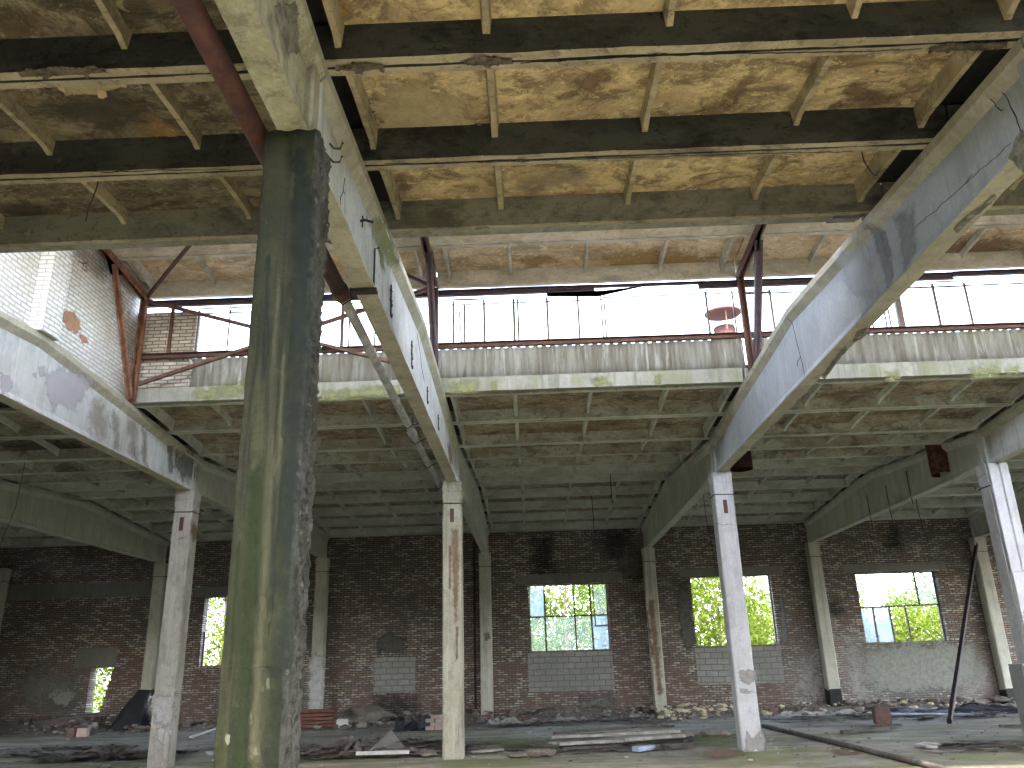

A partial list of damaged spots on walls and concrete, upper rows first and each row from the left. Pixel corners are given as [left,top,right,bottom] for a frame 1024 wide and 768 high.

spalling [18,66,127,99]
spalling [461,55,513,69]
crack [914,92,1021,228]
spalling [954,195,996,233]
peeling [32,366,93,411]
leakage [251,149,313,768]
rust [449,530,459,659]
rust [646,600,663,695]
peeling [739,669,758,694]
peeling [745,727,766,752]